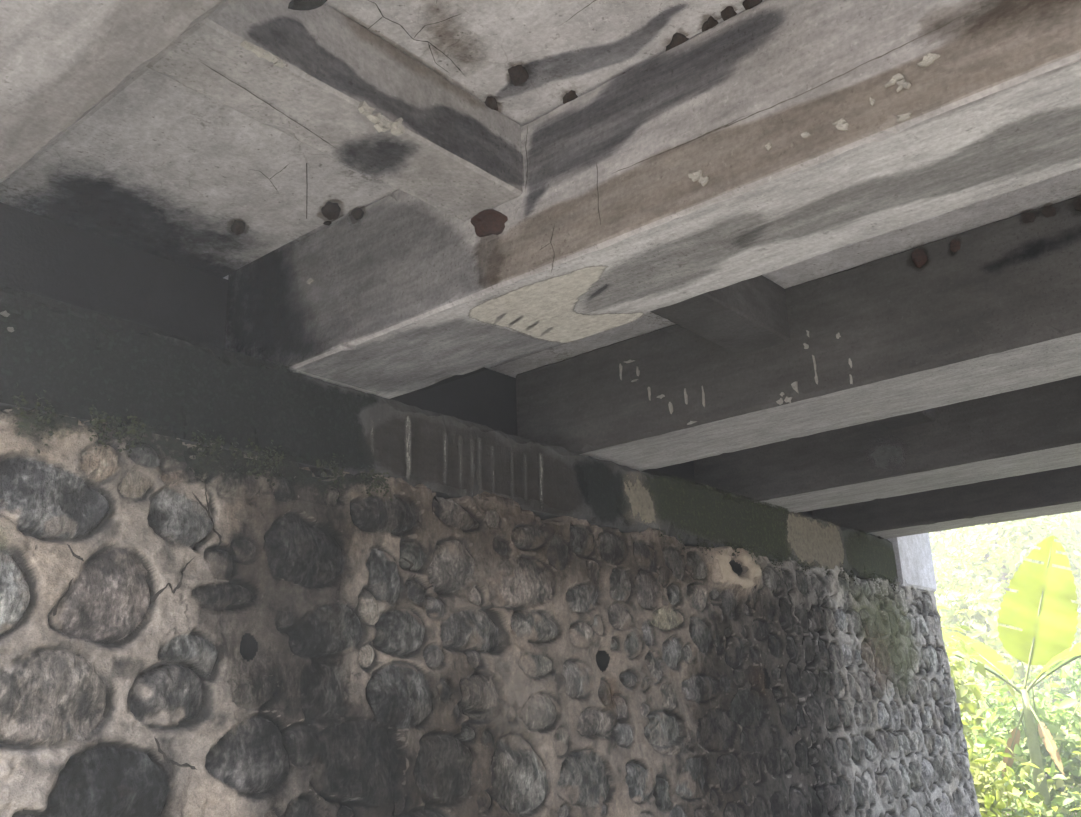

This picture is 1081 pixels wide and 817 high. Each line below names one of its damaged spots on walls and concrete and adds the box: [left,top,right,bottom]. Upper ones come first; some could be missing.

crack [363,0,464,75]
corrosion [665,32,689,52]
corrosion [702,0,762,32]
damp [522,14,779,158]
damp [382,97,639,213]
corrosion [318,200,364,226]
corrosion [471,209,508,263]
damp [984,231,1081,271]
corrosion [1021,205,1056,223]
peeling [469,266,644,343]
damp [0,176,420,817]
damp [471,433,632,526]